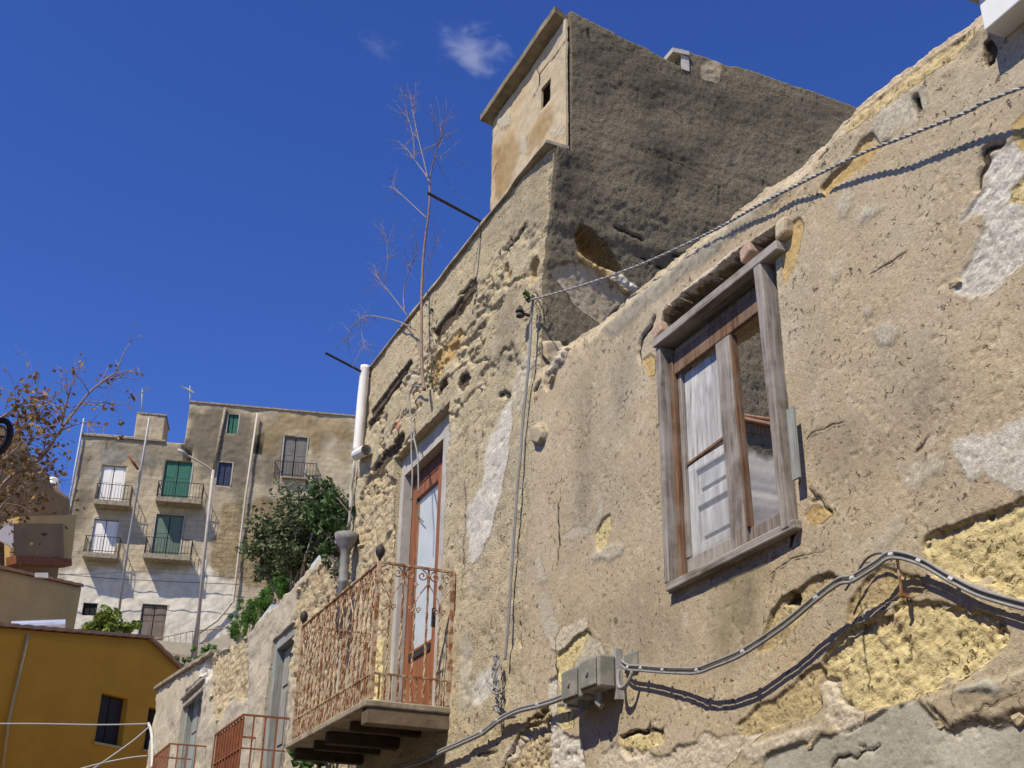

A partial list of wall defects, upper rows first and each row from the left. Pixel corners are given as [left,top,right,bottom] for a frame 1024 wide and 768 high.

spalling [846,28,998,131]
spalling [821,133,881,198]
spalling [949,113,1024,297]
flaking render [533,231,638,336]
spalling [430,328,471,396]
spalling [560,499,623,561]
spalling [599,497,1024,768]